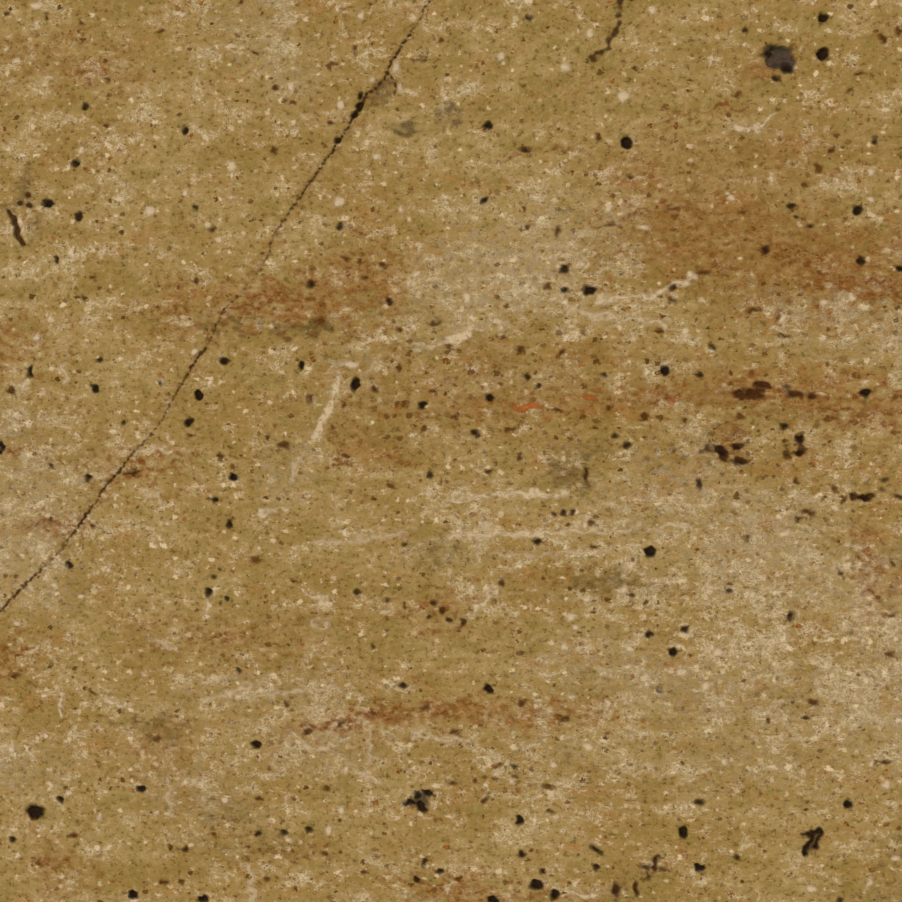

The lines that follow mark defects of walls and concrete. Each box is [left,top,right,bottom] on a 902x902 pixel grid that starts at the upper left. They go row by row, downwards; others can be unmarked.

crack [266,34,411,259]
crack [169,308,225,406]
crack [73,433,152,534]
crack [0,569,42,612]